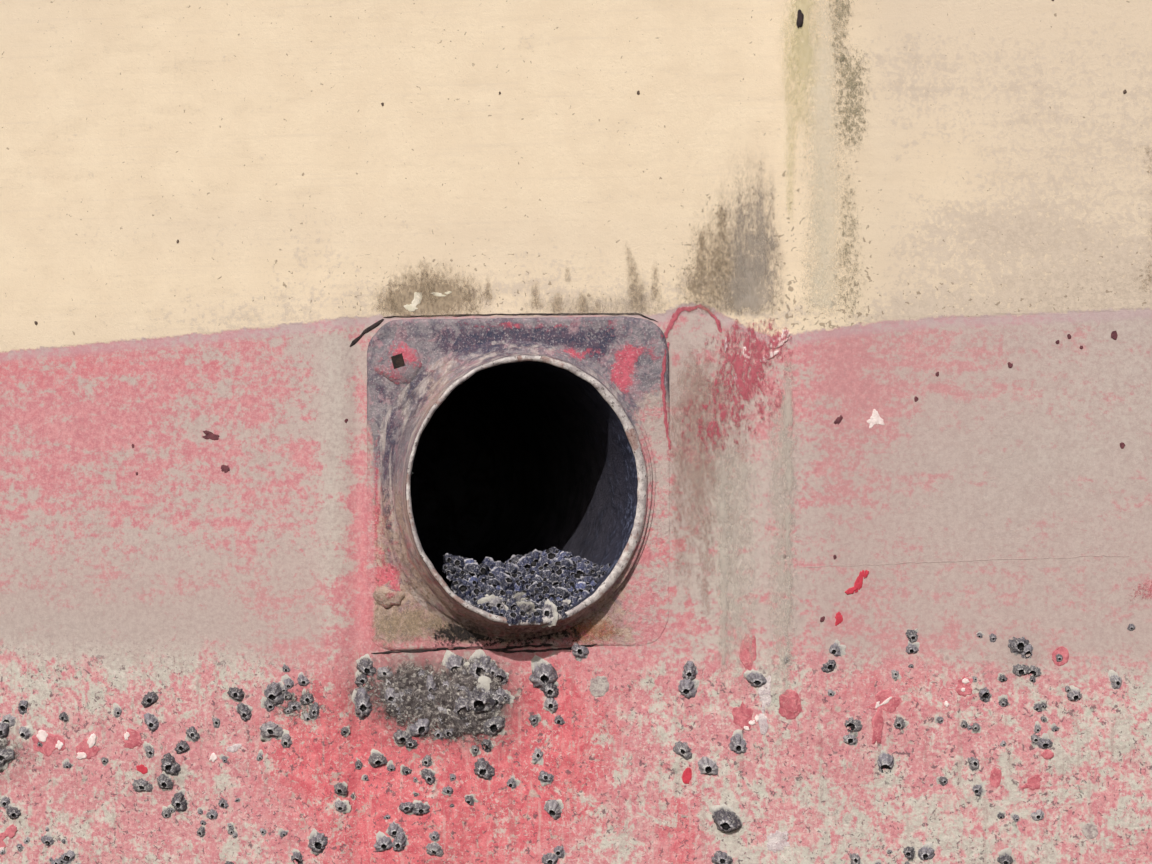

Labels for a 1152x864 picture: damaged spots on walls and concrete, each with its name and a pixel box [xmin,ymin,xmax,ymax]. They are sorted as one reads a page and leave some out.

mould [829,0,866,143]
water stain [688,197,773,311]
water stain [378,274,489,315]
peeling [660,304,792,450]
peeling [739,634,757,670]
peeling [732,675,802,735]
peeling [866,690,901,744]
peeling [32,730,100,760]
peeling [122,728,143,749]
peeling [682,768,692,784]
peeling [990,768,1002,788]
peeling [0,824,17,852]